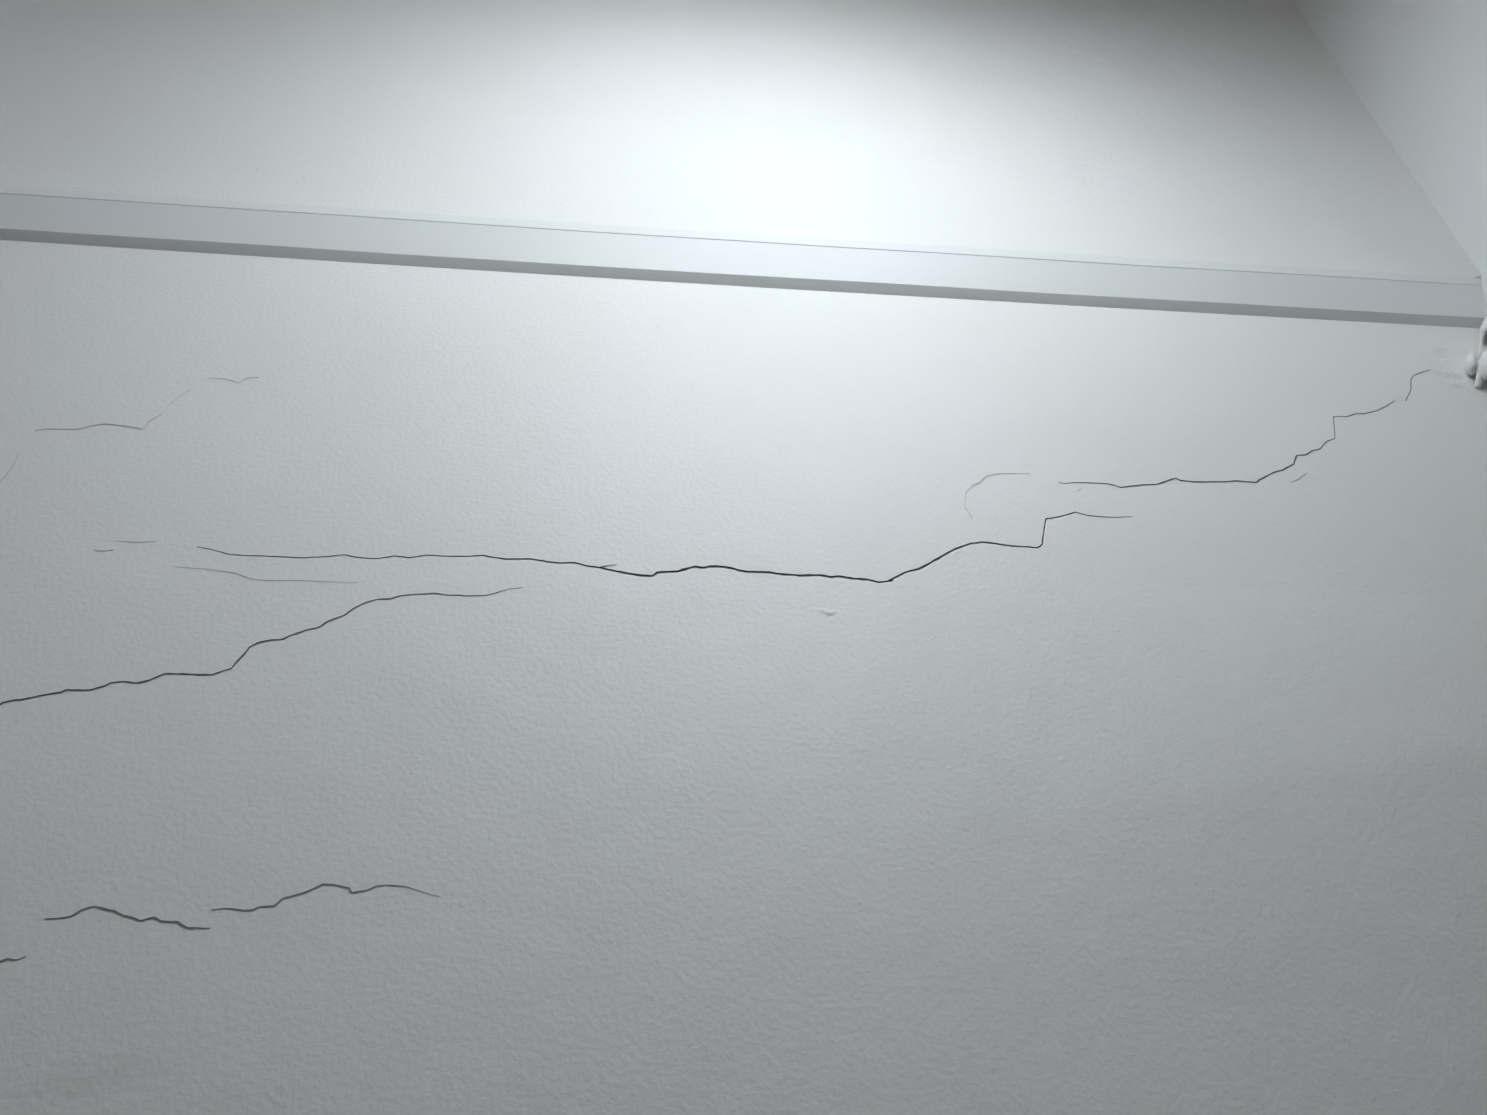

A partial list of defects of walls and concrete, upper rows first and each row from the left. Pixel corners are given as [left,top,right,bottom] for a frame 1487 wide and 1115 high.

crack [0,370,1429,705]
crack [44,883,439,929]